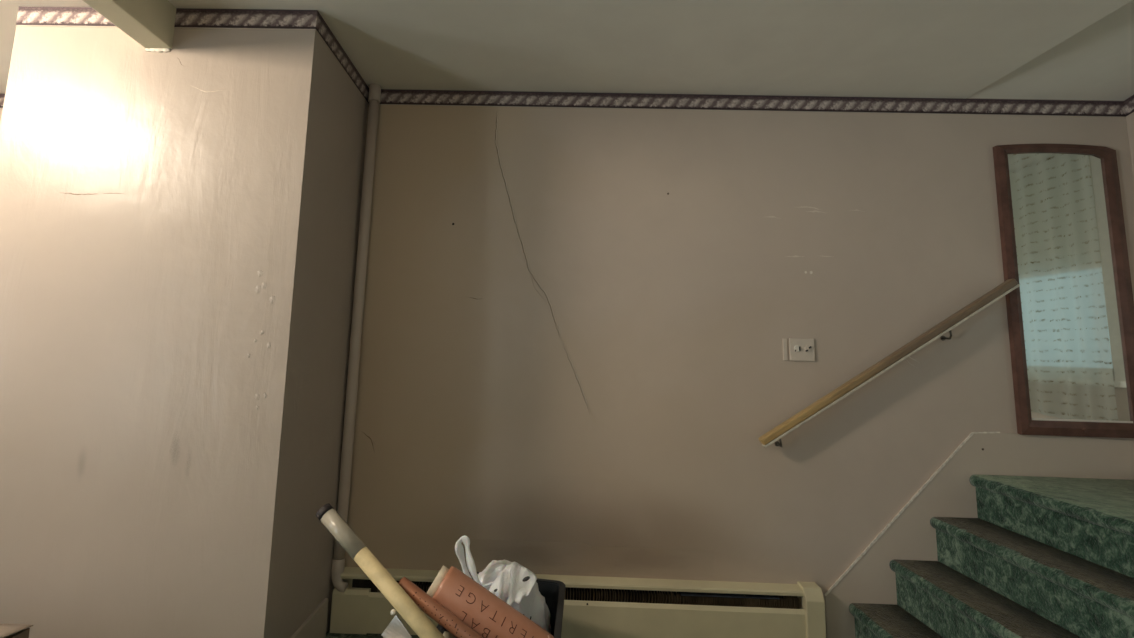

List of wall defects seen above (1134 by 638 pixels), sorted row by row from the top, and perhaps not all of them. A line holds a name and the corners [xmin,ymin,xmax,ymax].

crack [495,112,589,410]